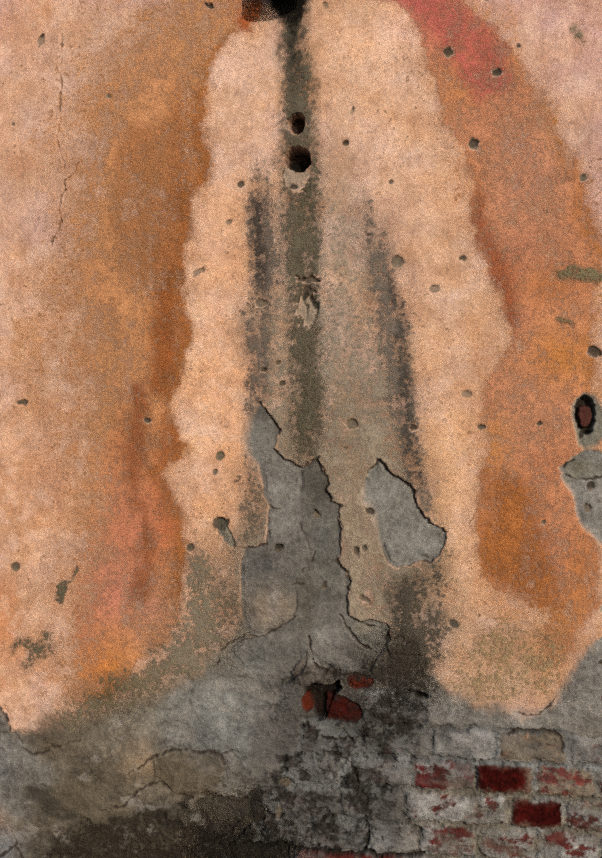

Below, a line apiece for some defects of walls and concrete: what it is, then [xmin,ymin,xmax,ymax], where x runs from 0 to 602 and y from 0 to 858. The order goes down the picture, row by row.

crack [50,30,81,250]
hole [13,397,32,407]
water stain [43,0,452,858]
hole [7,560,22,575]
flaking render [192,385,602,858]
crack [0,705,83,758]
crack [0,823,85,858]
crack [99,747,427,858]